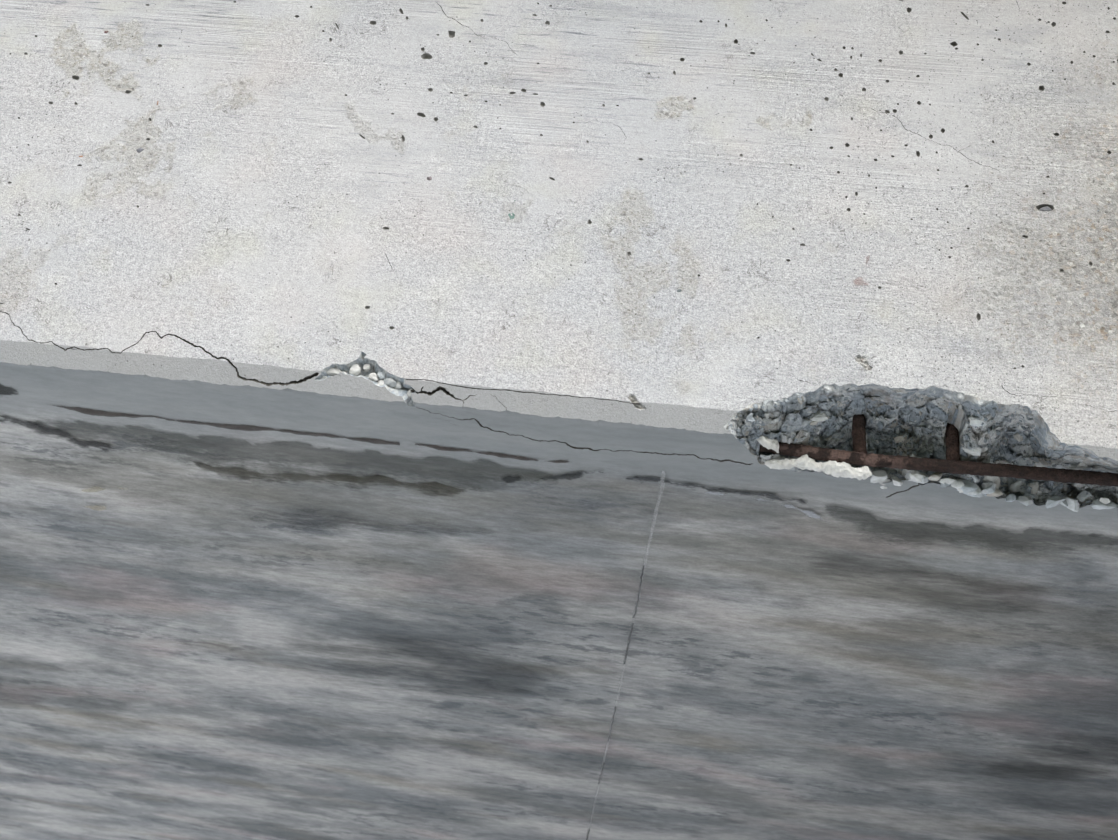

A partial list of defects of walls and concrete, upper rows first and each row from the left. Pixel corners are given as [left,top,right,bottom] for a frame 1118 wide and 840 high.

crack [0,303,319,386]
crack [406,379,751,465]
spalling [724,354,1118,512]